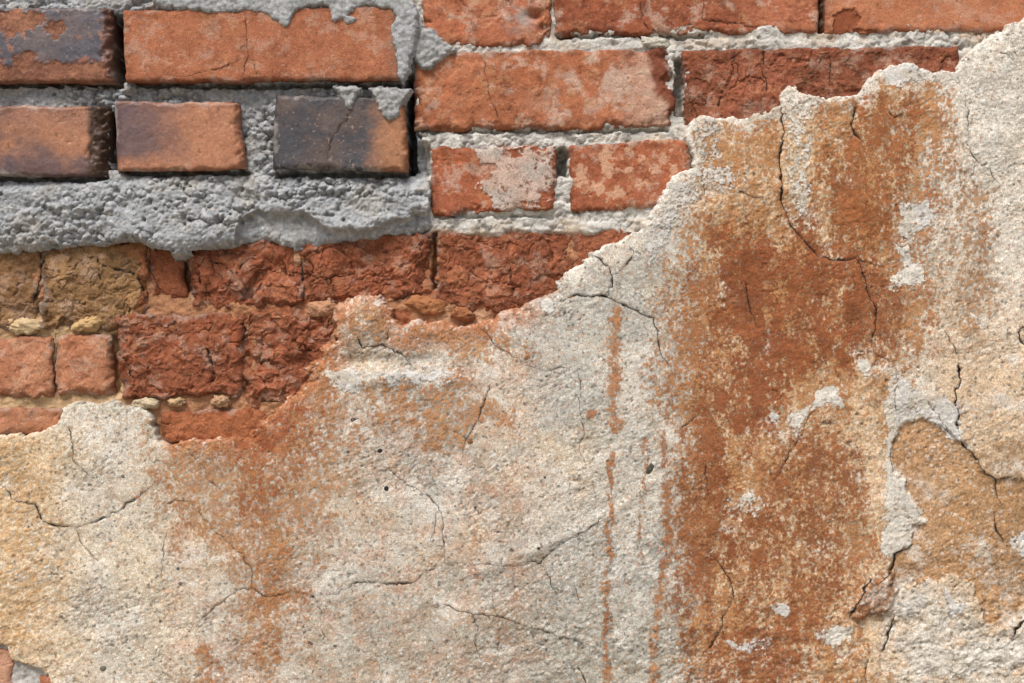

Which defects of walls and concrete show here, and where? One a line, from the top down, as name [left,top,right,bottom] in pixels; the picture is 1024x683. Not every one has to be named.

spalling [0,8,65,40]
spalling [833,9,877,35]
crack [5,469,609,683]
corrosion [134,299,542,683]
spalling [0,17,1024,454]
corrosion [586,305,628,433]
corrosion [599,451,617,683]
crack [556,246,673,369]
crack [701,51,907,482]
corrosion [637,77,1006,683]
crack [849,545,912,617]
crack [928,332,1015,543]